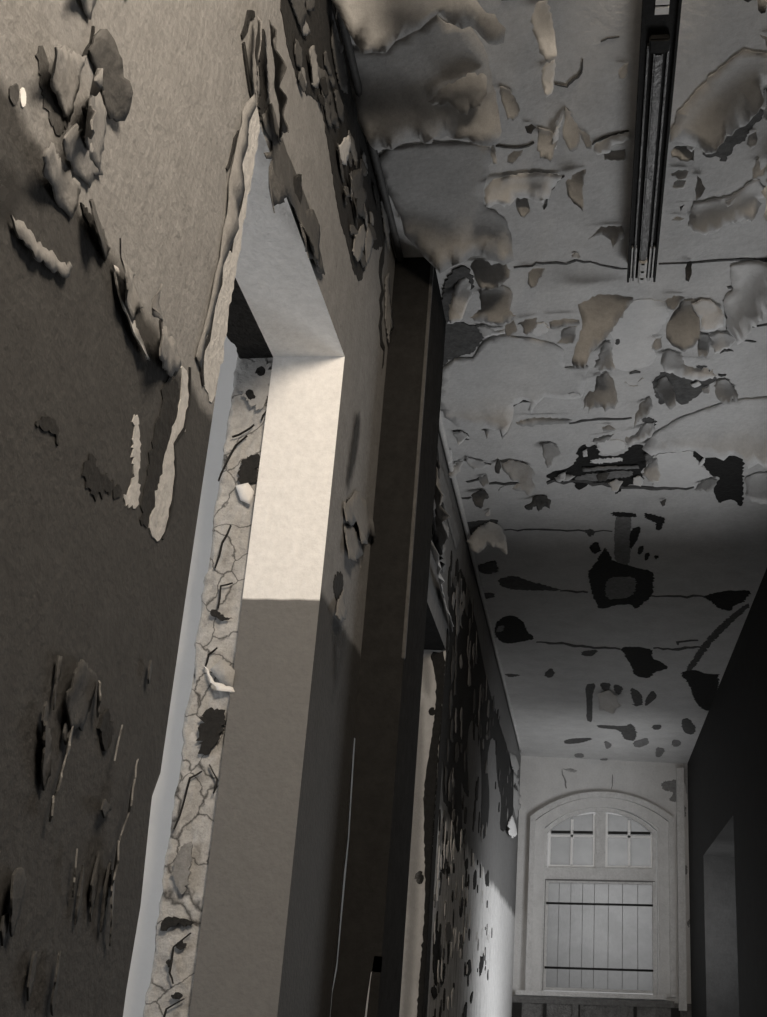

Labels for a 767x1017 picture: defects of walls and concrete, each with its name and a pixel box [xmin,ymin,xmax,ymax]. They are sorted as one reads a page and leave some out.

spalling [8,83,26,107]
peeling [10,215,73,278]
spalling [588,499,666,609]
spalling [210,582,233,621]
peeling [41,655,123,822]
spalling [173,707,226,829]
spalling [204,647,235,693]
peeling [414,449,551,1017]
spalling [494,616,702,678]
peeling [585,683,696,757]
spalling [681,670,720,711]
spalling [160,916,194,1017]